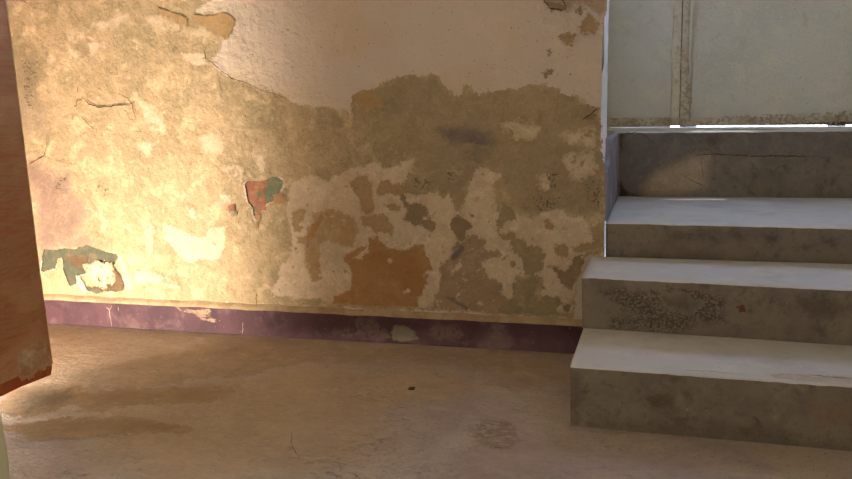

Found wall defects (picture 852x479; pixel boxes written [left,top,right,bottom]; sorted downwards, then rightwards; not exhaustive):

peeling [64,7,130,63]
peeling [143,12,210,66]
crack [203,49,290,101]
crack [72,86,136,128]
peeling [131,90,169,160]
peeling [499,114,541,142]
peeling [198,124,600,314]
flaking render [30,217,226,296]
peeling [175,306,220,323]
peeling [330,316,419,343]
peeling [16,341,52,381]